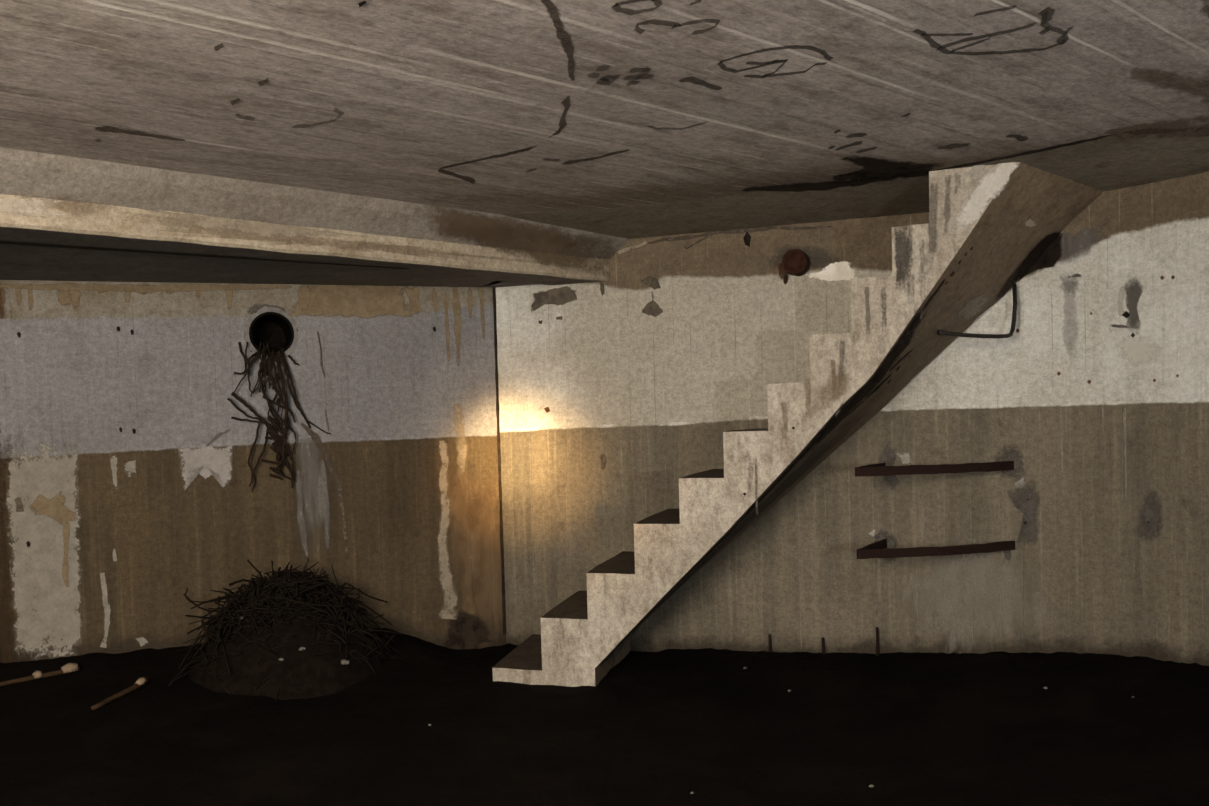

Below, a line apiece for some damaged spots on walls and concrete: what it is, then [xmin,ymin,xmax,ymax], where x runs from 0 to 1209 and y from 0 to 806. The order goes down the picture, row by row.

leakage [742,162,1018,293]
leakage [958,227,1100,318]
peeling [179,444,234,490]
rust [0,444,16,663]
peeling [7,443,83,657]